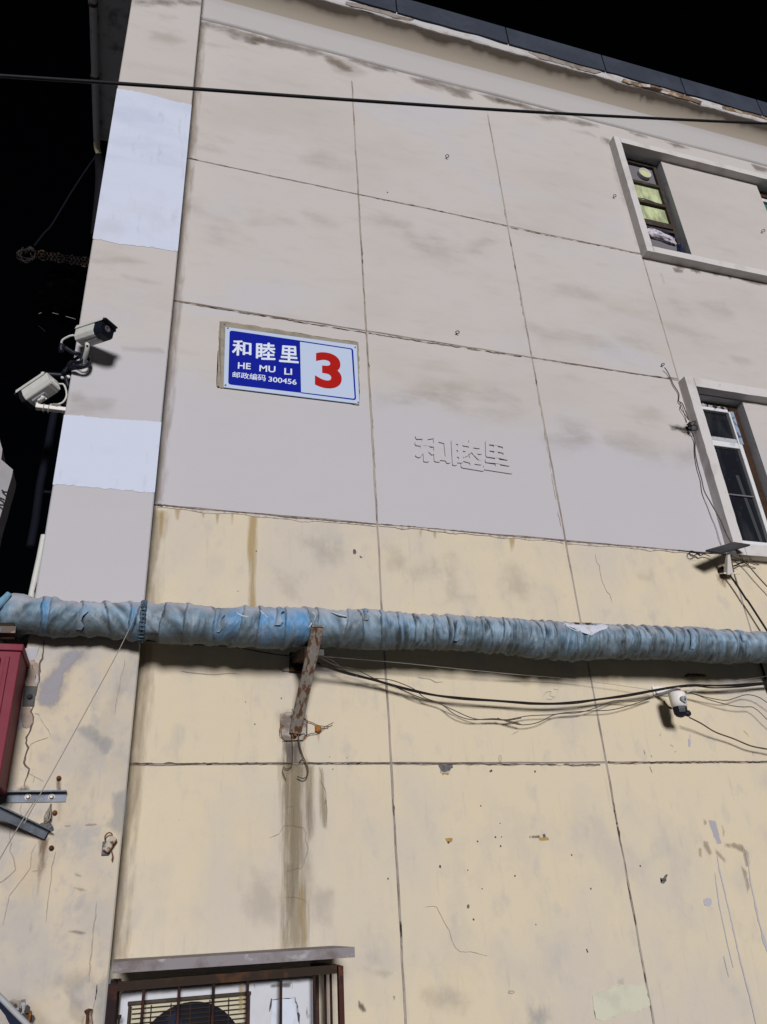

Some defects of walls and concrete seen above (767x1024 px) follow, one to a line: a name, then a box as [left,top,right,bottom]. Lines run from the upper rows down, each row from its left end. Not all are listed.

crack [1,640,56,922]
damp [285,741,325,942]
crack [399,921,407,1023]
crack [133,735,767,938]
peeling [704,821,767,1023]